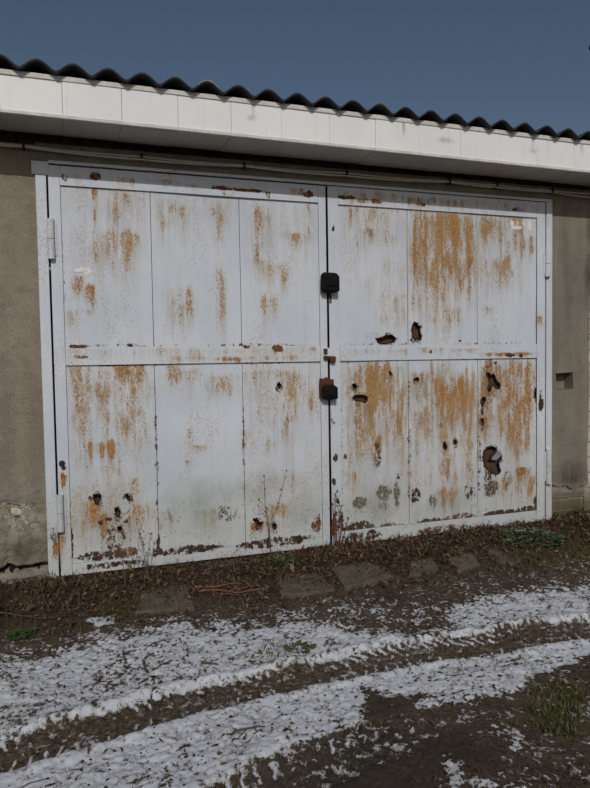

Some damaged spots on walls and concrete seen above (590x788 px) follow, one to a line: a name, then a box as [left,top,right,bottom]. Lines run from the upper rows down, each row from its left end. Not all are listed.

corrosion [63,272,96,313]
corrosion [89,172,145,271]
corrosion [211,185,270,198]
corrosion [253,207,289,293]
corrosion [286,188,313,245]
corrosion [334,192,536,329]
spalling [0,501,43,531]
corrosion [59,460,67,488]
corrosion [80,478,173,558]
corrosion [68,344,232,484]
corrosion [211,343,319,441]
corrosion [330,342,544,536]